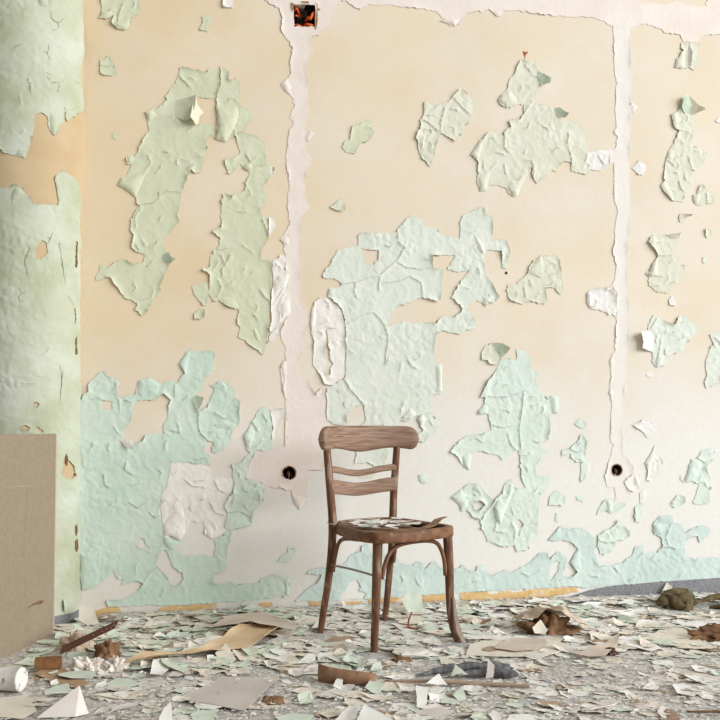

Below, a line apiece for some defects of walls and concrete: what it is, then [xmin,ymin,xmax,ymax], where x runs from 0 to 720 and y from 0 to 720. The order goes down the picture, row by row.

peeling [0,0,85,158]
peeling [0,170,372,629]
peeling [95,66,291,354]
peeling [354,448,393,479]
peeling [310,206,563,442]
peeling [416,88,477,167]
peeling [471,59,611,197]
peeling [451,342,720,606]
peeling [646,232,685,306]
peeling [641,315,698,377]
peeling [661,95,716,205]
peeling [381,549,448,637]